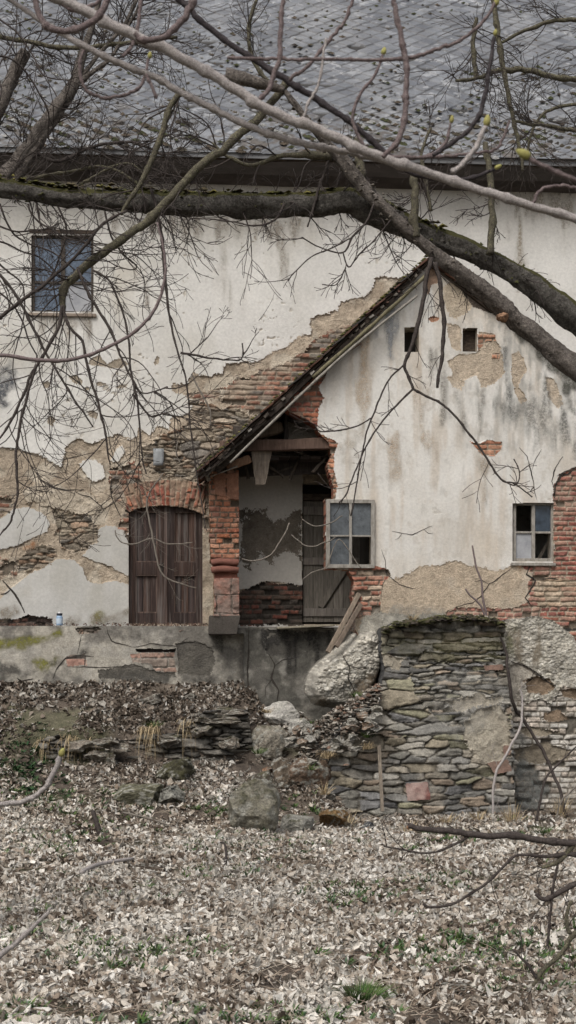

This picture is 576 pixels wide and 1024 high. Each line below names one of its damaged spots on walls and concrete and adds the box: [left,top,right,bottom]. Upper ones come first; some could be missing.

spalling [427,268,527,403]
spalling [0,275,403,635]
spalling [470,439,502,456]
peeling [239,467,576,660]
crack [17,627,189,683]
spalling [66,640,216,680]
crack [247,630,294,702]
spalling [509,662,576,811]